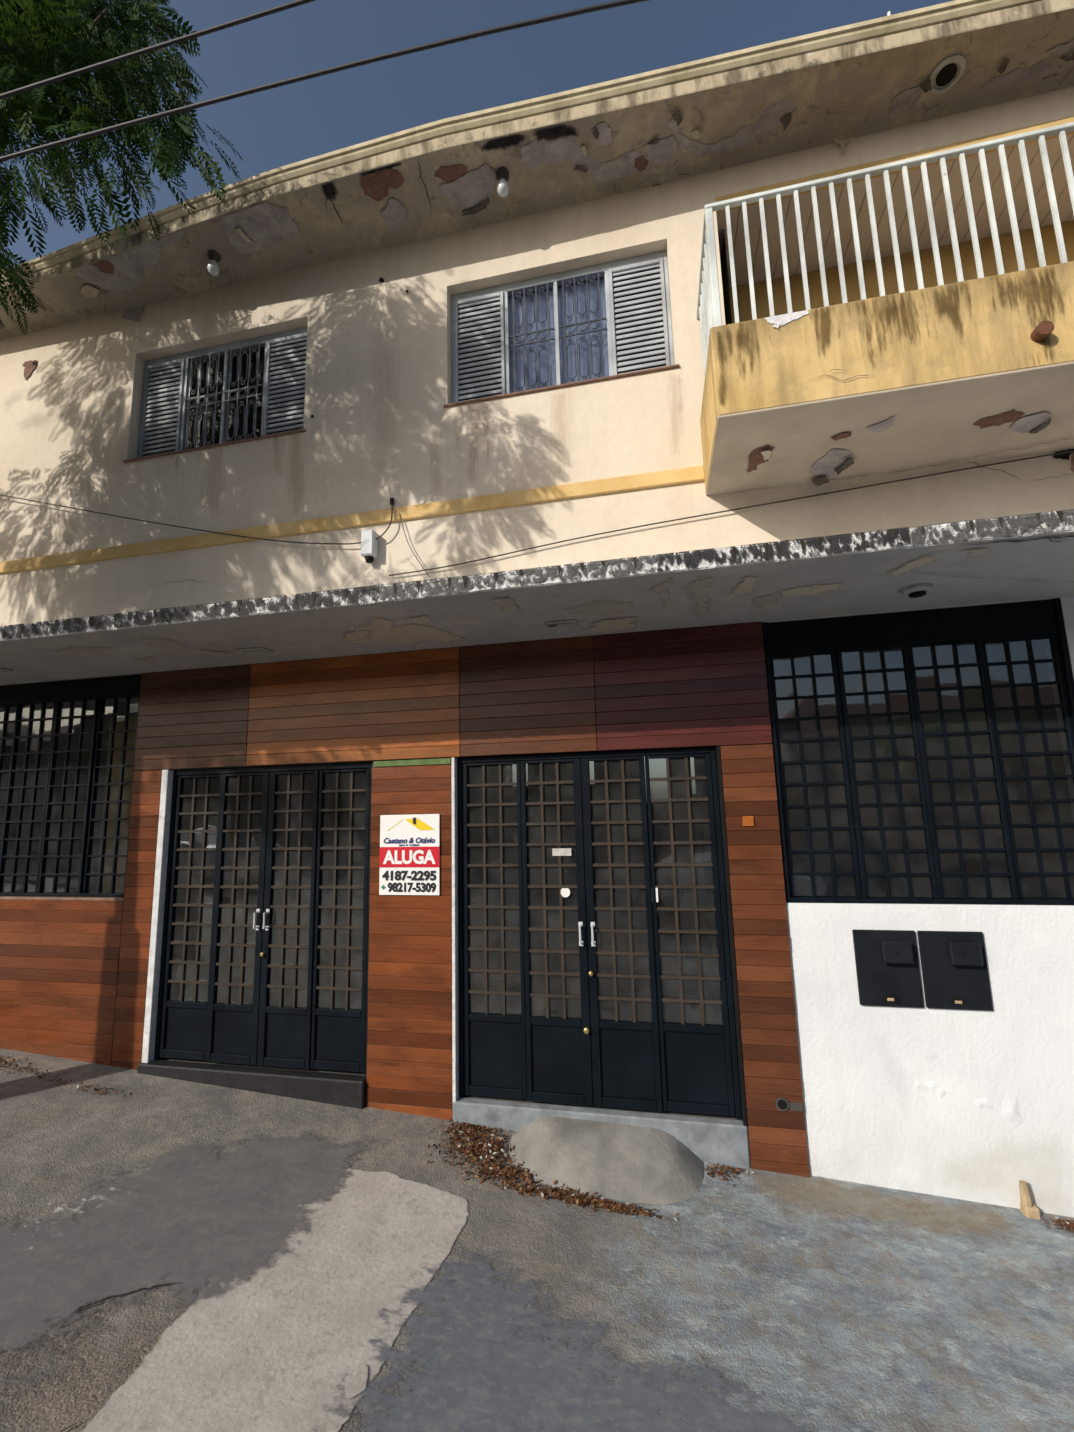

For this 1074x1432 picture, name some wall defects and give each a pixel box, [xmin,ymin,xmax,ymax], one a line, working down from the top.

peeling [520,123,677,186]
spalling [434,164,496,216]
leakage [815,306,830,353]
leakage [862,294,918,350]
leakage [933,284,970,334]
leakage [993,268,1063,357]
leakage [717,322,758,403]
peeling [973,409,1051,434]
peeling [746,445,774,473]
peeling [810,416,894,486]
spalling [1052,449,1074,472]
leakage [0,509,1074,639]